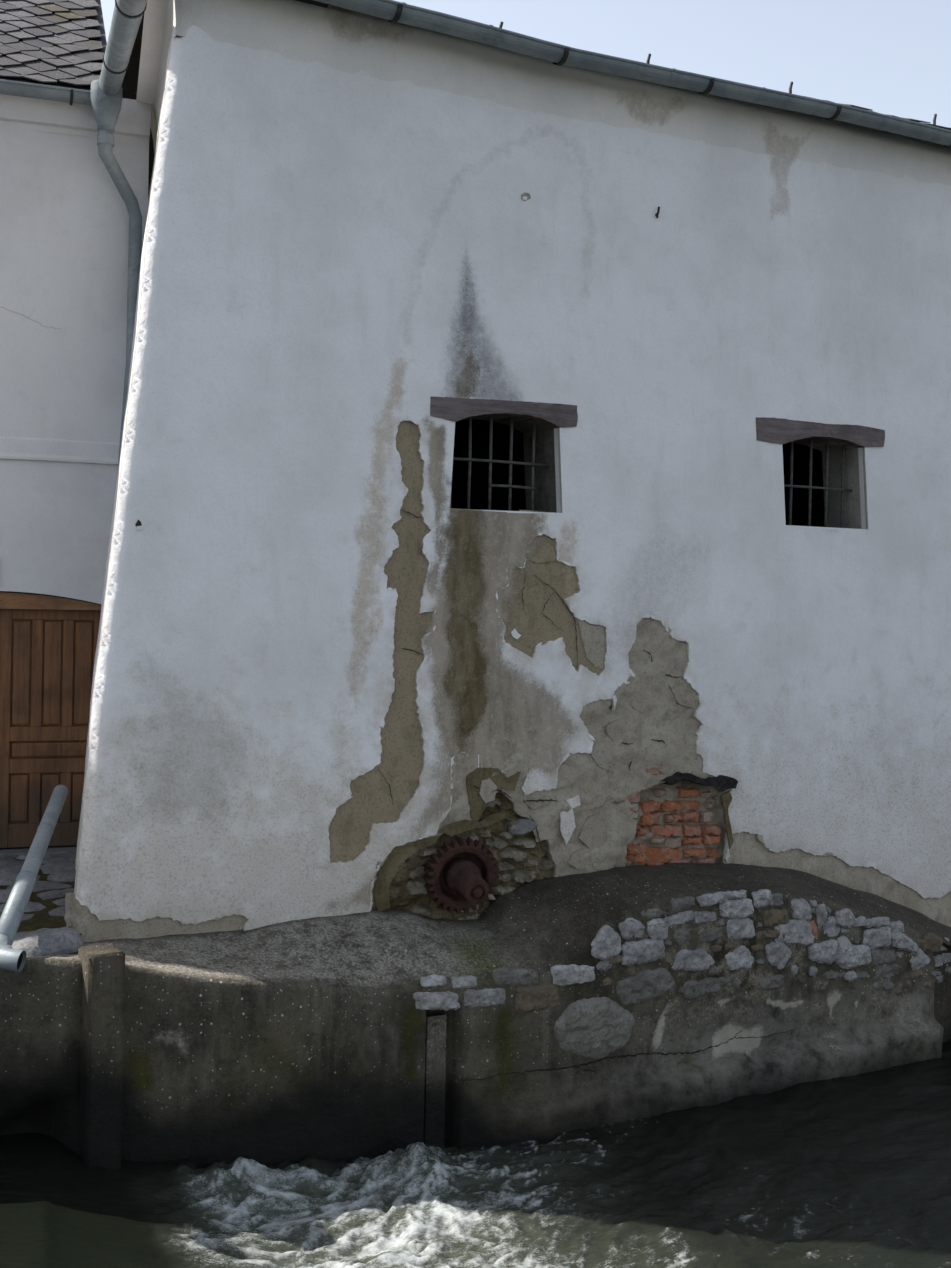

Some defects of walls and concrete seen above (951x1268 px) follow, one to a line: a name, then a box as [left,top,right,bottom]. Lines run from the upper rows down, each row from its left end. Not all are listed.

flaking render [328,421,436,863]
leakage [417,420,574,838]
flaking render [496,533,609,675]
flaking render [371,615,951,927]
crack [453,1029,796,1081]